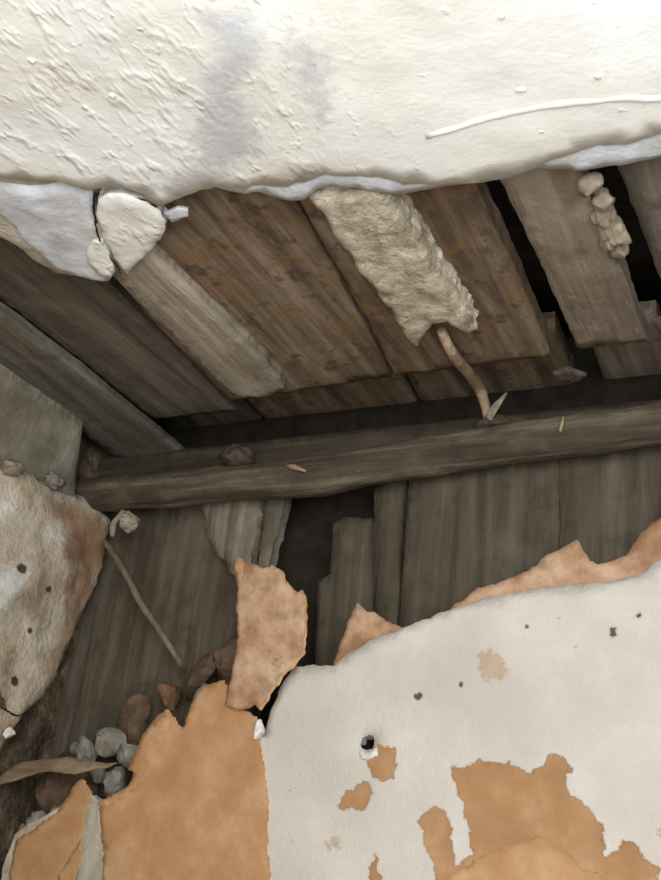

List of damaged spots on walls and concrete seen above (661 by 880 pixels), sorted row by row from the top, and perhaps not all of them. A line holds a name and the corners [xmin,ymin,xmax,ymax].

spalling [201,134,661,201]
crack [92,192,122,274]
flaking render [451,518,661,609]
flaking render [333,603,402,666]
peeling [1,556,308,880]
peeling [339,745,397,811]
peeling [418,753,660,880]
peeling [369,856,382,880]